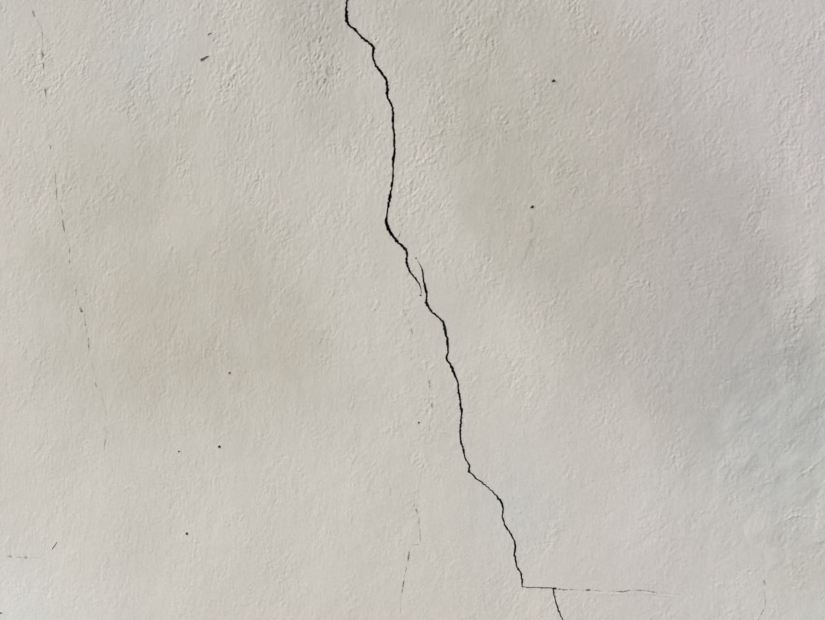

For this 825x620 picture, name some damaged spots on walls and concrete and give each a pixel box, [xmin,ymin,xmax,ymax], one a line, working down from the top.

crack [343,0,565,620]